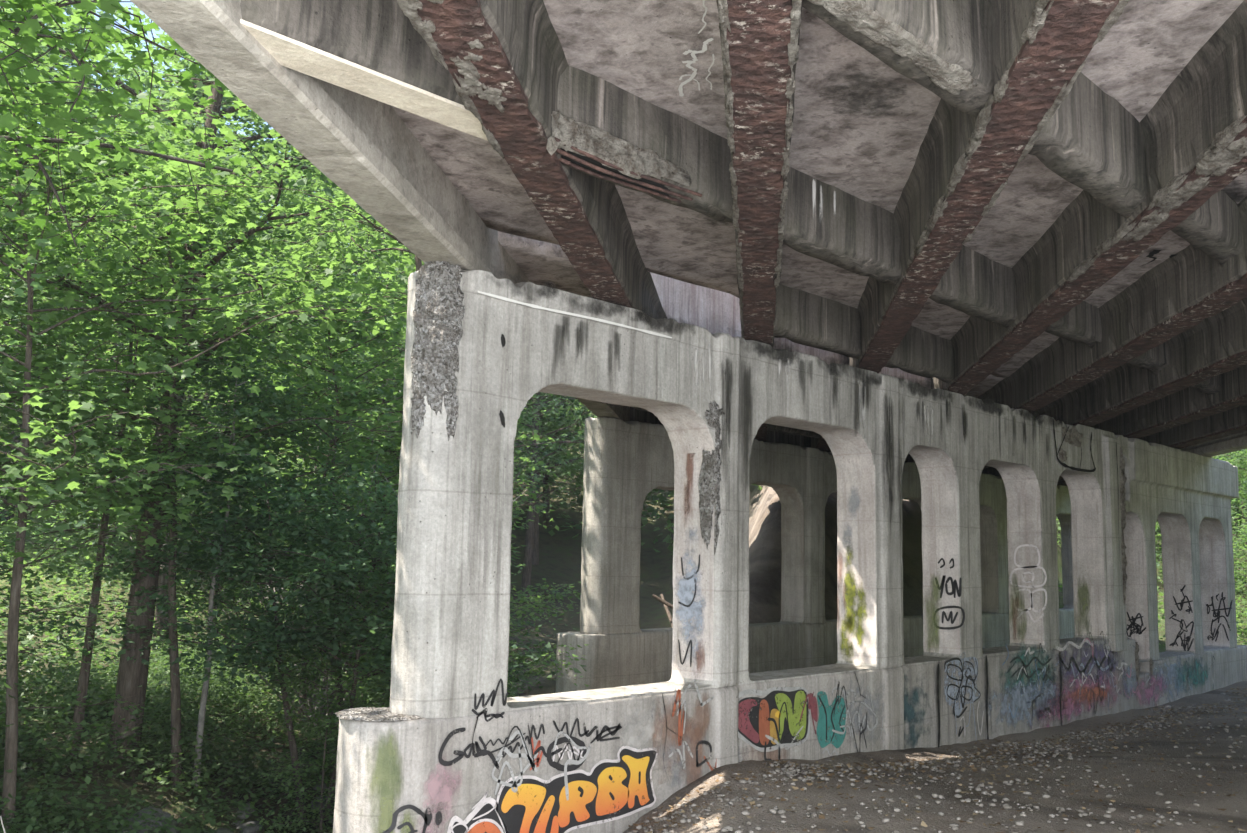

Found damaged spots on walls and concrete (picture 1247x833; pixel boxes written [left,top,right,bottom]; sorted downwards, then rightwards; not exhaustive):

corrosion [408,0,444,34]
corrosion [450,39,507,113]
spalling [410,261,465,441]
damp [555,318,588,356]
damp [609,333,619,372]
damp [778,359,804,384]
damp [855,377,869,430]
damp [917,400,966,436]
spalling [698,401,725,555]
damp [883,412,902,521]